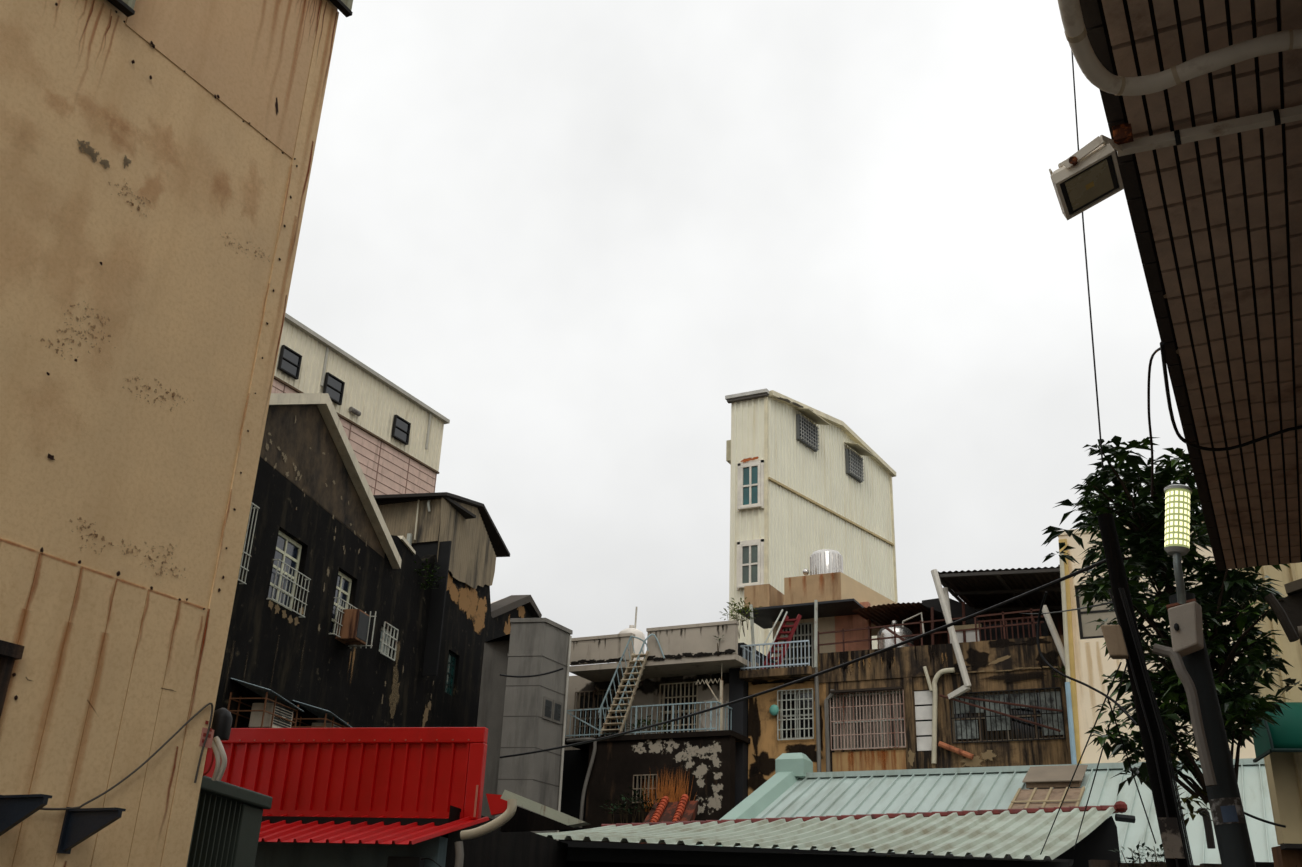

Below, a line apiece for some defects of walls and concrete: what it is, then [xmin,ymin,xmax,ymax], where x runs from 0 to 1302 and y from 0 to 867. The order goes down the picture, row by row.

peeling [77,139,150,217]
peeling [40,303,111,359]
peeling [70,517,186,583]
flaking render [446,573,487,634]
corrosion [162,594,210,713]
peeling [633,695,729,815]